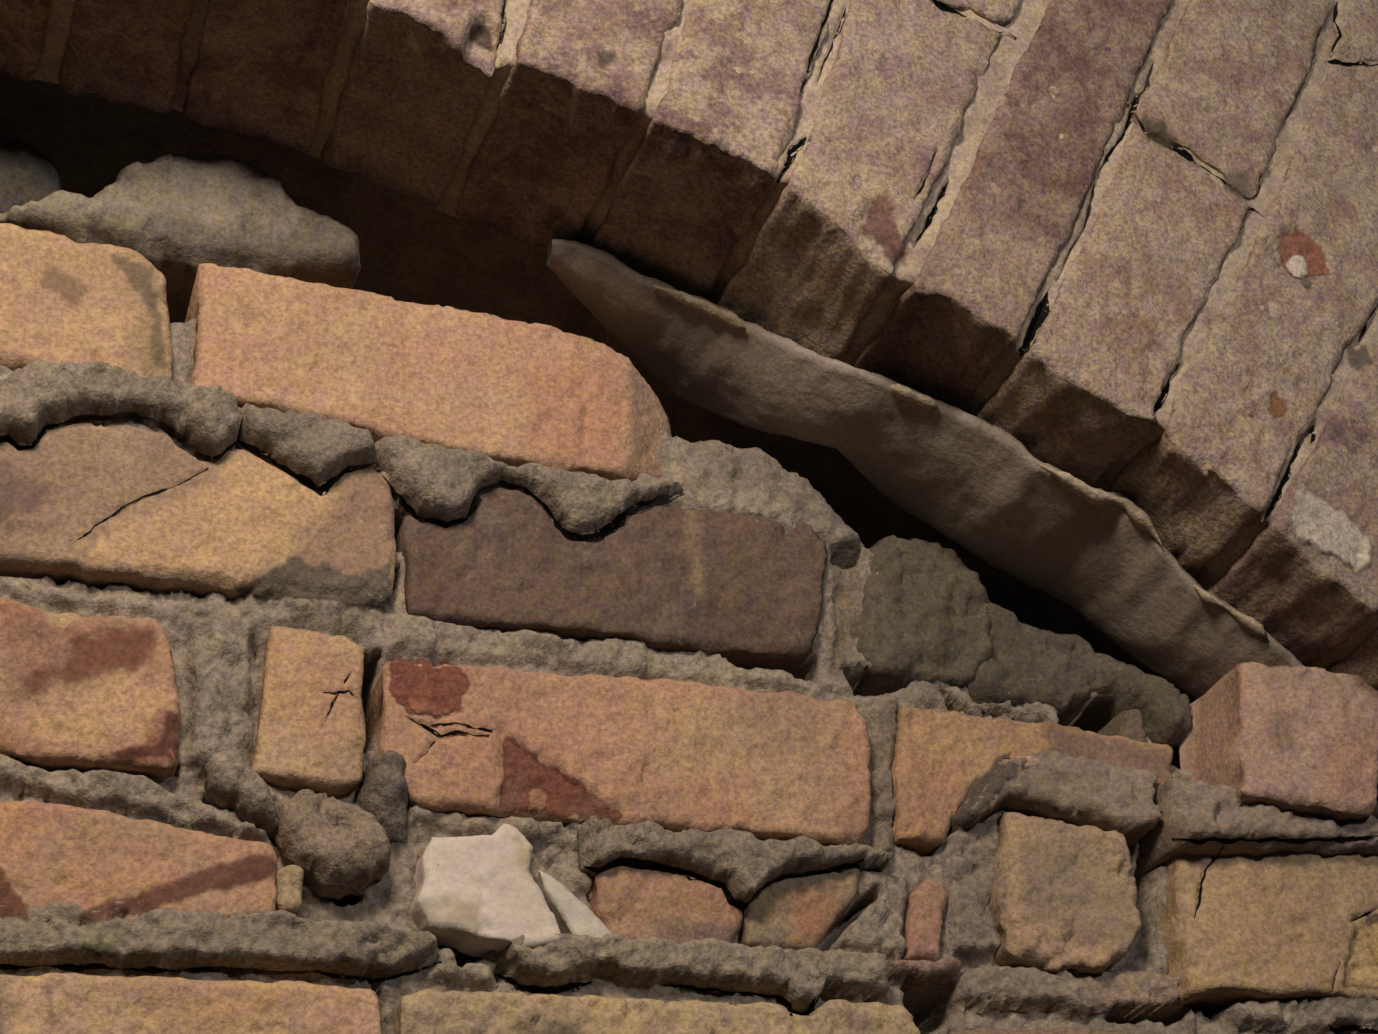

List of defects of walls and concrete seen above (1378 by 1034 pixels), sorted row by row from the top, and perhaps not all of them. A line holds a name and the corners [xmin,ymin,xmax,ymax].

crack [800,0,846,94]
crack [932,0,966,17]
crack [777,137,807,183]
crack [1019,62,1262,356]
crack [0,412,685,543]
crack [405,716,492,763]